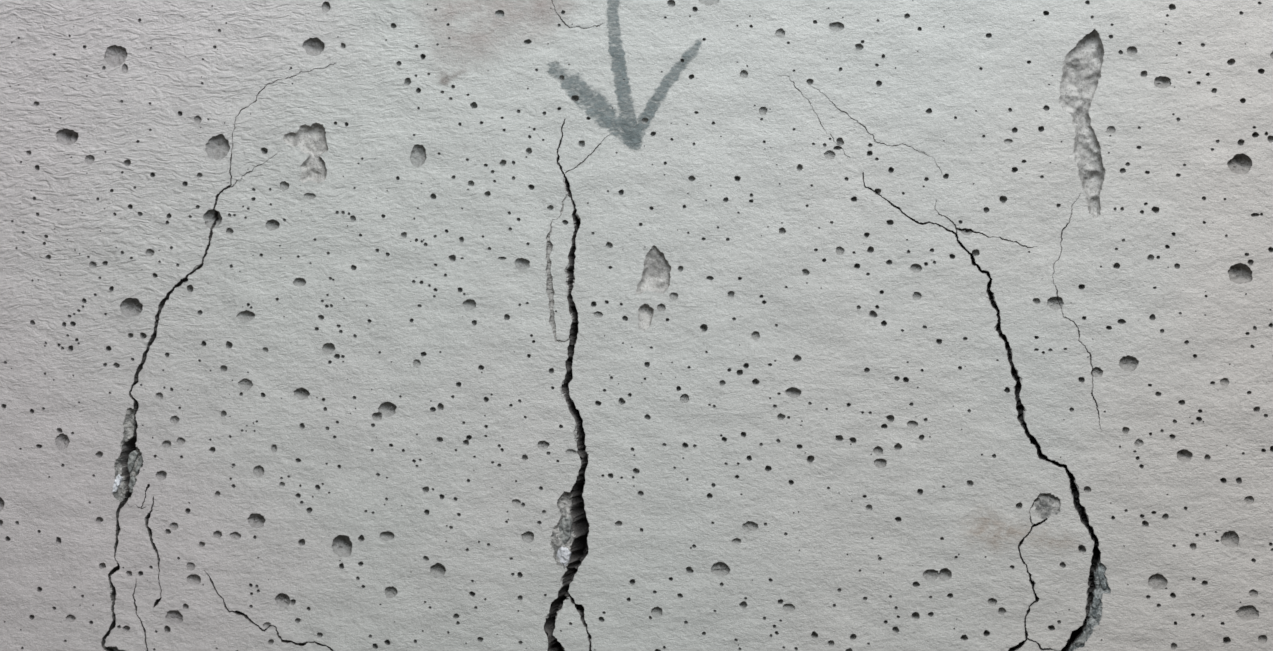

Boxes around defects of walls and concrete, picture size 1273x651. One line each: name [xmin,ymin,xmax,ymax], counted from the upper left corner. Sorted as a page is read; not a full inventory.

spalling [95,408,167,502]
crack [101,62,336,651]
spalling [521,531,534,543]
spalling [550,491,577,569]
crack [544,118,609,651]
crack [779,75,1101,651]